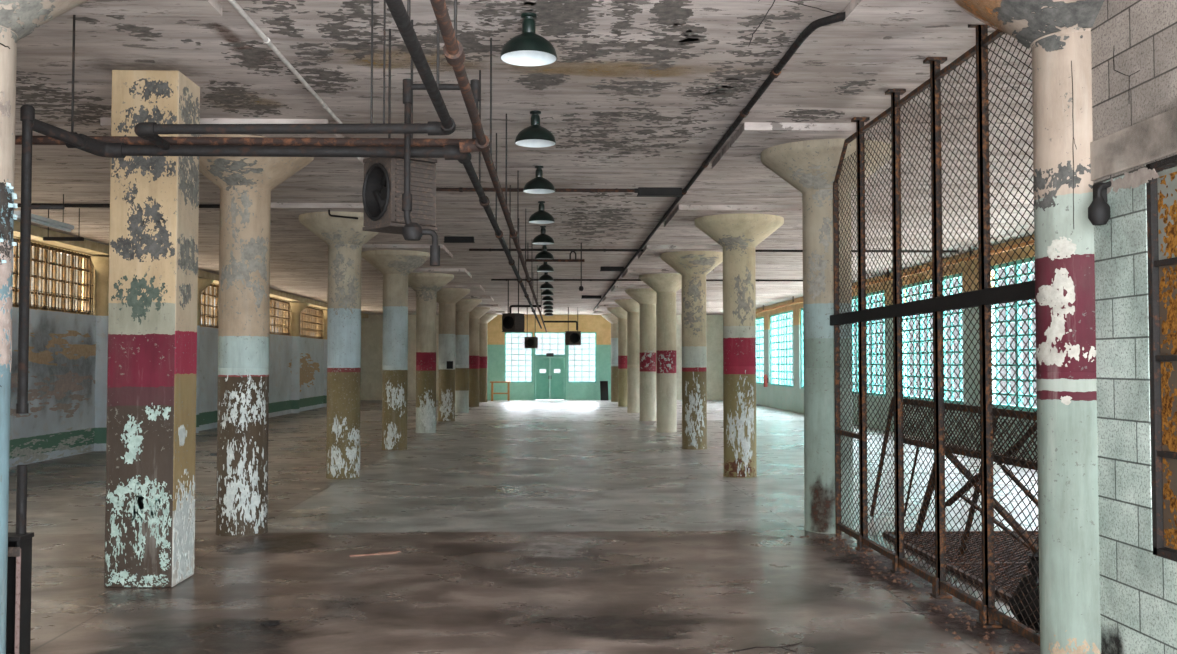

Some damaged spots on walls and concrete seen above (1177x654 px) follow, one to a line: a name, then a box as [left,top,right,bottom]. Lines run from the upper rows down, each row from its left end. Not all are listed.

peeling [0,0,812,167]
crack [748,0,838,47]
peeling [992,0,1104,54]
peeling [0,179,96,466]
peeling [110,156,269,325]
peeling [1036,236,1096,367]
peeling [105,403,195,587]
peeling [217,371,269,535]
peeling [327,416,360,478]
peeling [384,381,454,450]
peeling [725,370,756,477]
damp [1101,633,1123,654]